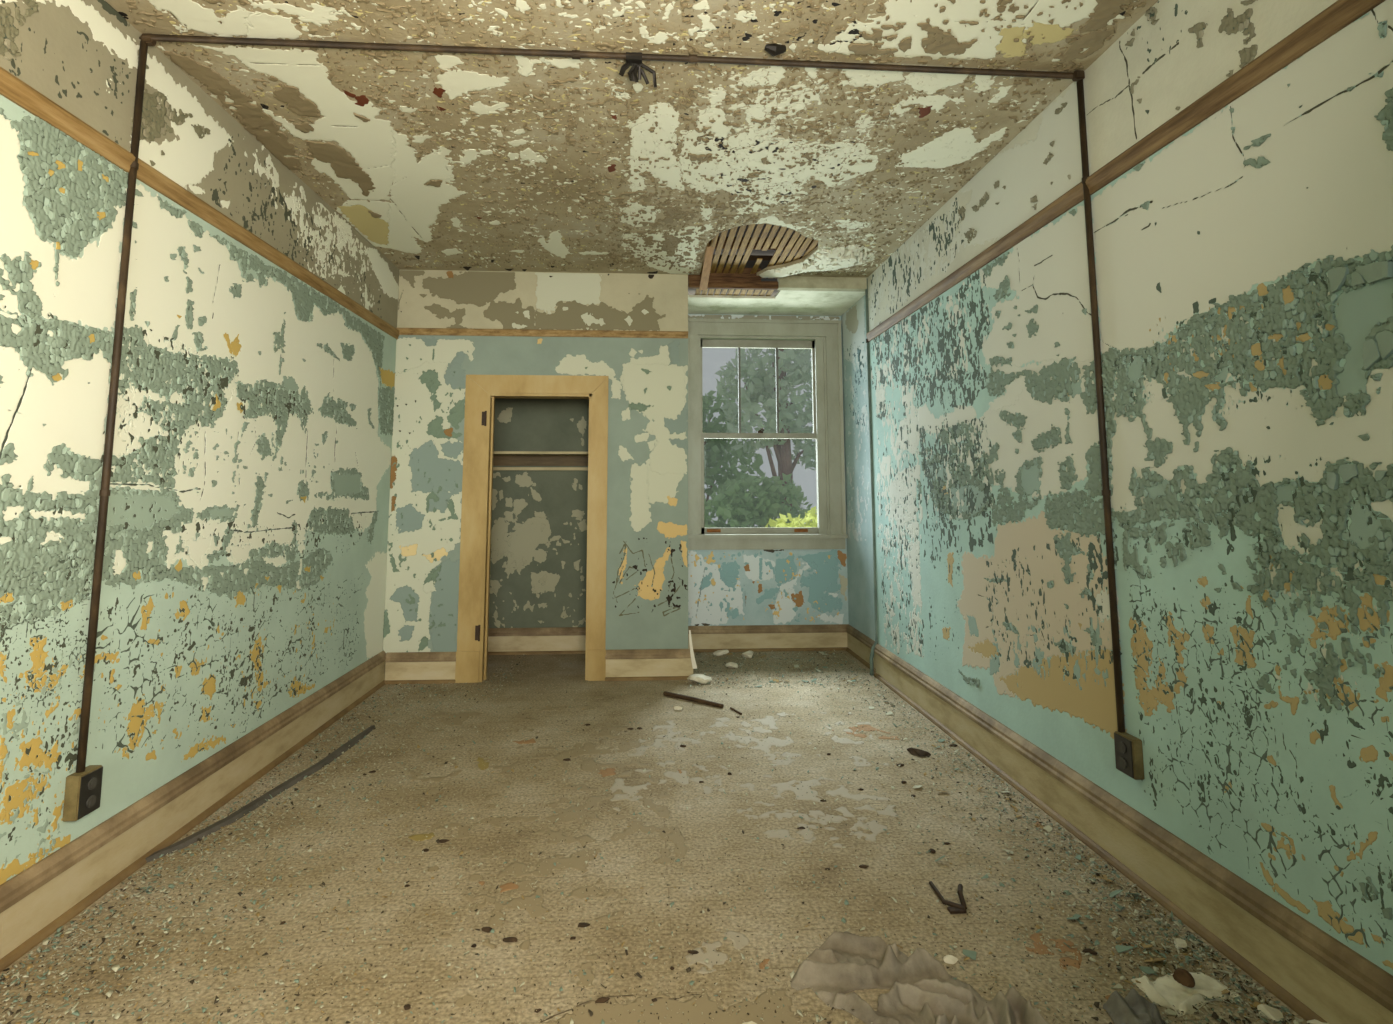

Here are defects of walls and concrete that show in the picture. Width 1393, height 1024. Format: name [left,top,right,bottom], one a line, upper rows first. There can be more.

crack [1087,12,1257,140]
crack [1301,9,1393,146]
peeling [0,550,1310,1024]
flaking render [0,0,1393,744]
crack [918,199,1393,948]